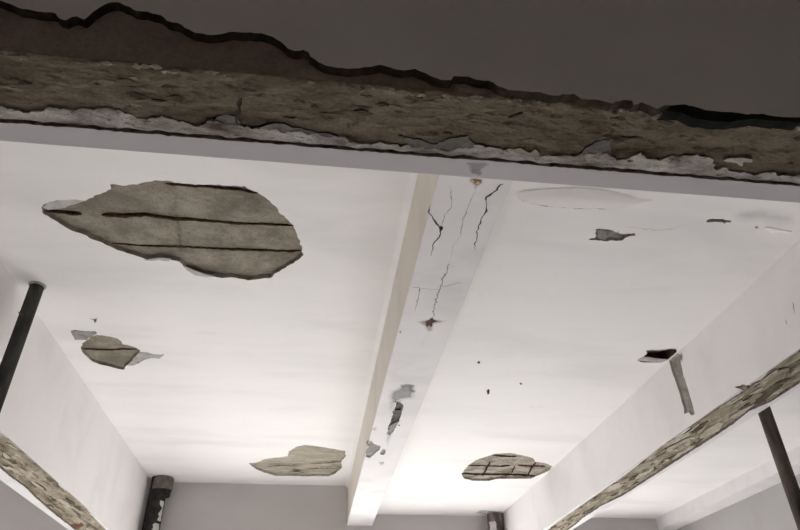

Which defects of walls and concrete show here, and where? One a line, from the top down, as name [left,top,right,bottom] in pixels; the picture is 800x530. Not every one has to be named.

spalling [0,8,800,184]
spalling [42,180,303,280]
crack [410,184,503,318]
spalling [589,229,635,241]
spalling [71,318,164,370]
spalling [0,433,105,530]
spalling [249,445,346,476]
spalling [365,440,386,465]
spalling [386,401,403,435]
spalling [462,453,552,481]
spalling [548,349,800,530]